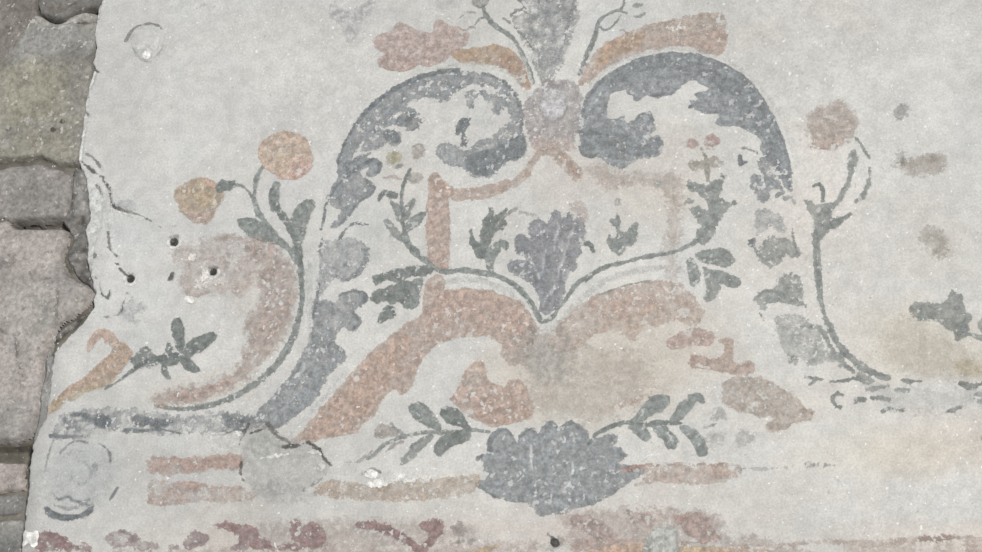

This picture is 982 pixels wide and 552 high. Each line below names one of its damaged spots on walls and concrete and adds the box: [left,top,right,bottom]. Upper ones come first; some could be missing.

crack [211,422,332,481]